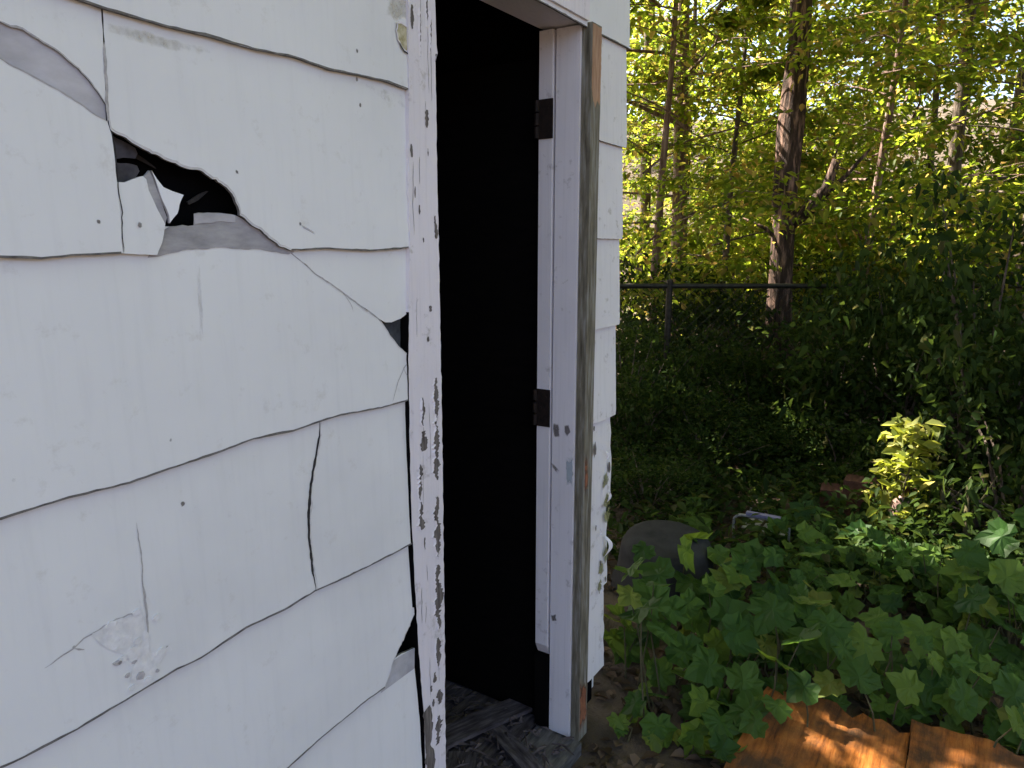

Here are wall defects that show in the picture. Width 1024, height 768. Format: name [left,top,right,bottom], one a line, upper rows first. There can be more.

peeling [396,0,437,128]
spalling [0,21,294,258]
crack [292,253,378,319]
crack [45,523,149,668]
crack [307,425,322,587]
peeling [381,378,444,768]
peeling [112,655,160,682]